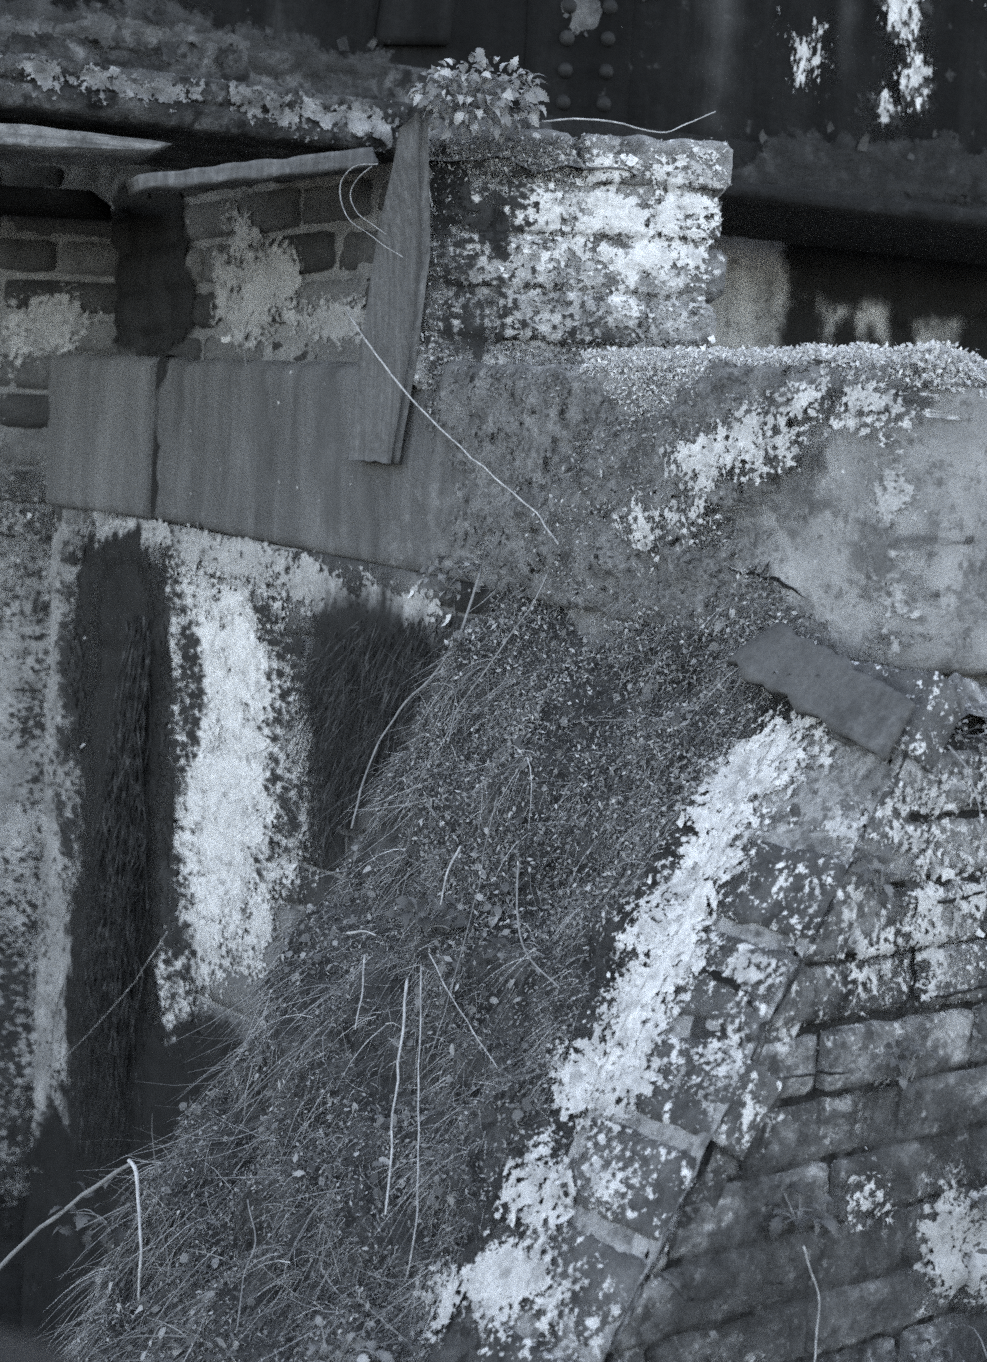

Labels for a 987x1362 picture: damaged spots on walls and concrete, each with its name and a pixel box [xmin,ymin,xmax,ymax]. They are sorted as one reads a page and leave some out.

peeling [777,17,834,93]
peeling [857,0,937,151]